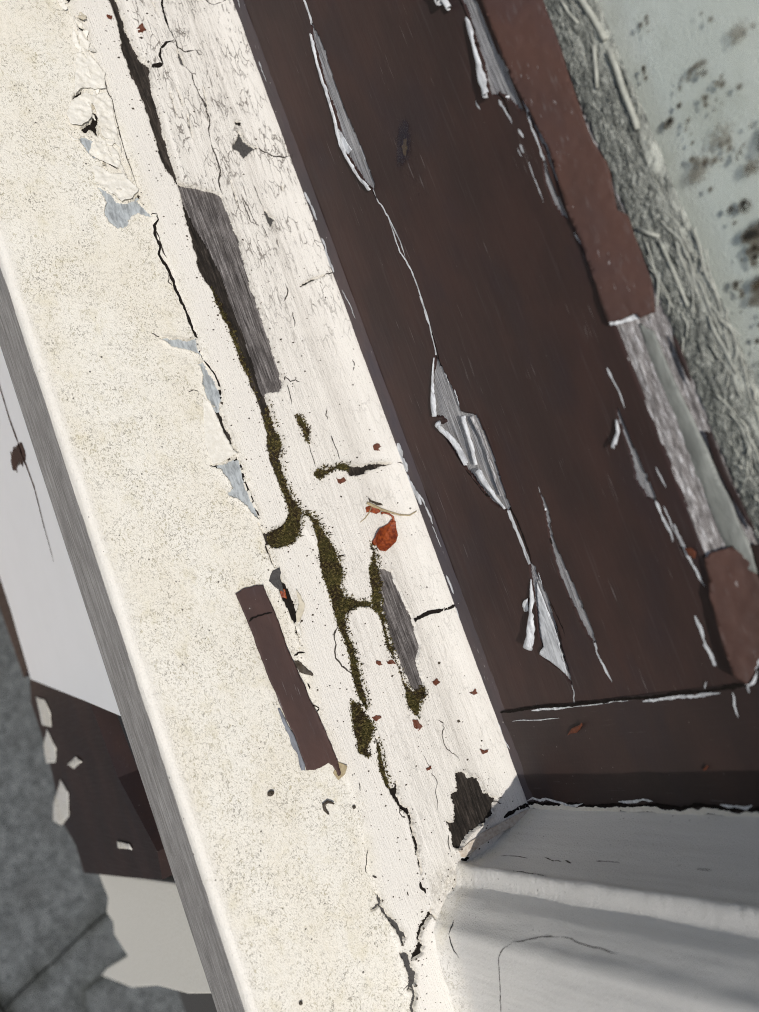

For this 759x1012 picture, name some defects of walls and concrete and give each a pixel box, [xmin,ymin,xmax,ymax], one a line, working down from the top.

peeling [58,0,152,229]
crack [109,0,403,549]
peeling [303,0,575,700]
mould [664,102,690,131]
mould [679,60,707,90]
mould [689,137,757,175]
mould [726,199,759,305]
peeling [607,368,704,585]
peeling [538,487,612,682]
crack [424,720,456,809]
crack [500,660,759,721]
crack [359,737,430,1012]